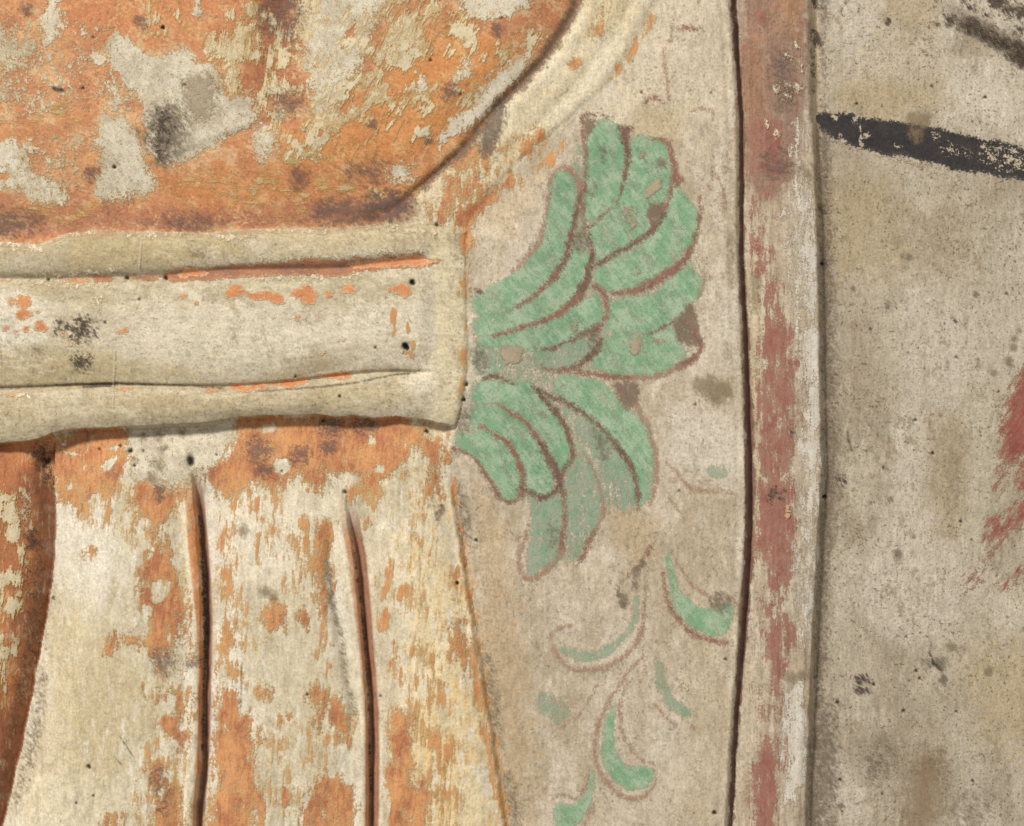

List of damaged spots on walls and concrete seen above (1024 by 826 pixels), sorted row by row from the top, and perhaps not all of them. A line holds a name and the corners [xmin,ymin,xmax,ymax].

peeling [566,56,582,70]
peeling [587,2,607,42]
peeling [610,14,657,81]
peeling [773,41,804,102]
peeling [0,0,566,301]
peeling [457,319,467,399]
peeling [0,485,34,709]
peeling [39,414,511,826]